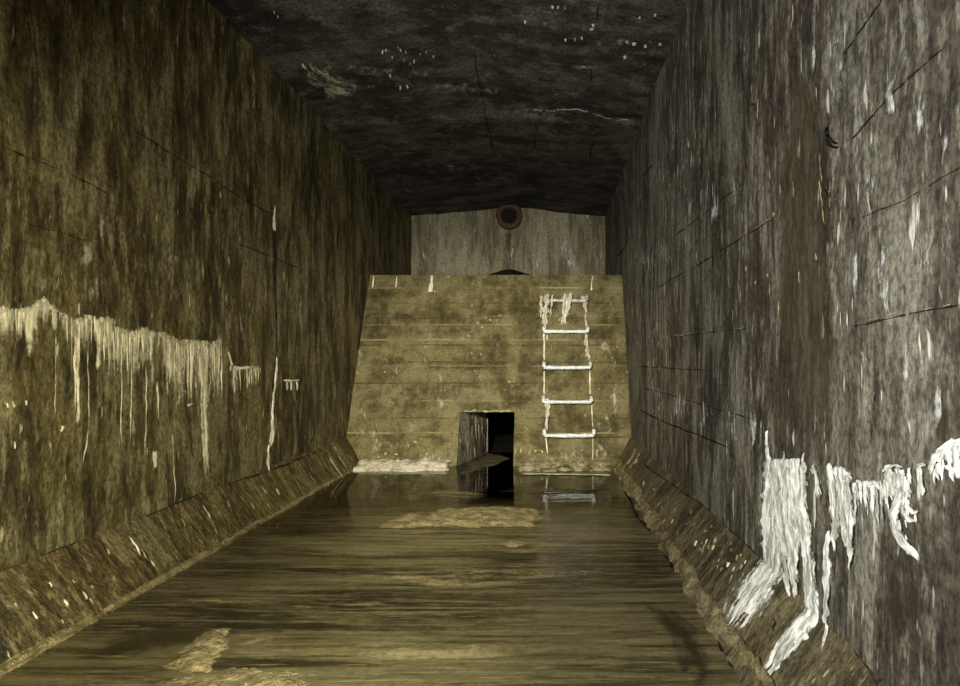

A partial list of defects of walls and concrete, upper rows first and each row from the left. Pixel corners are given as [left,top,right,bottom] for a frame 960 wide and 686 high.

crack [844,0,882,54]
crack [852,49,942,138]
crack [138,133,298,350]
crack [867,168,959,216]
damp [0,283,261,473]
damp [266,357,299,471]
damp [514,276,610,476]
damp [882,392,960,560]